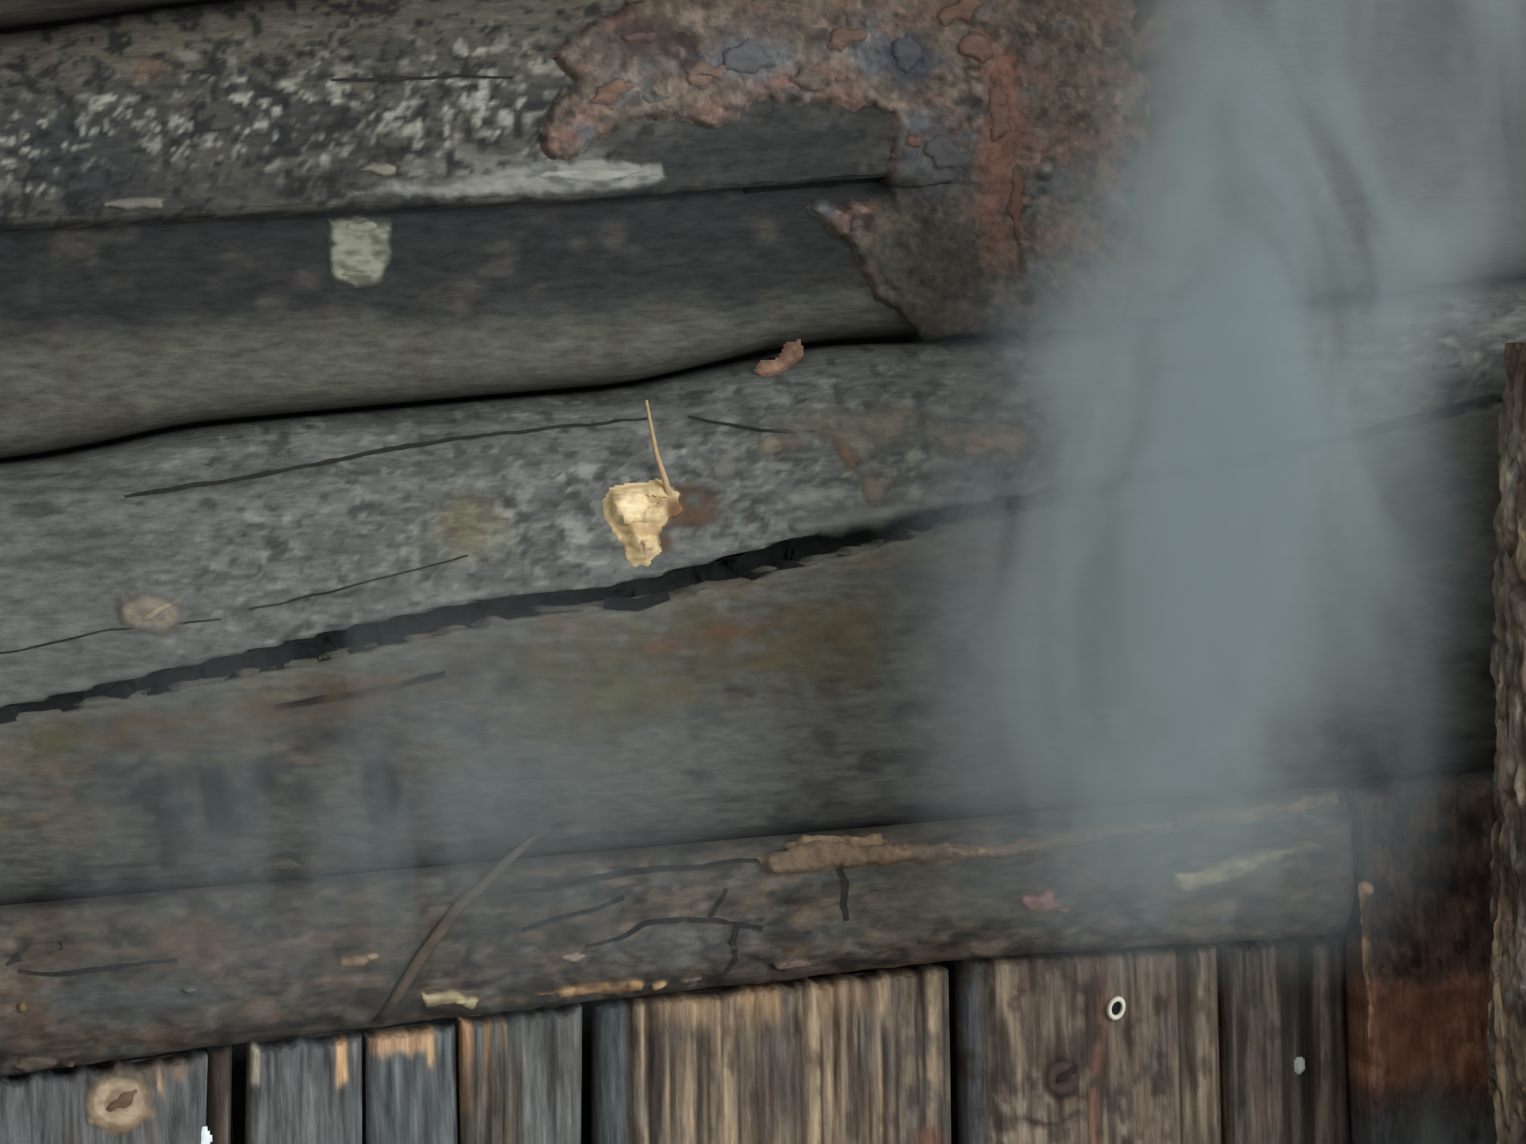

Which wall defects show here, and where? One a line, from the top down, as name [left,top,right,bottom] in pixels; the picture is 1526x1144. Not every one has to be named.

spalling [330,218,390,285]
crack [0,403,1465,724]
peeling [784,833,887,848]
crack [511,849,787,976]
crack [837,868,849,921]